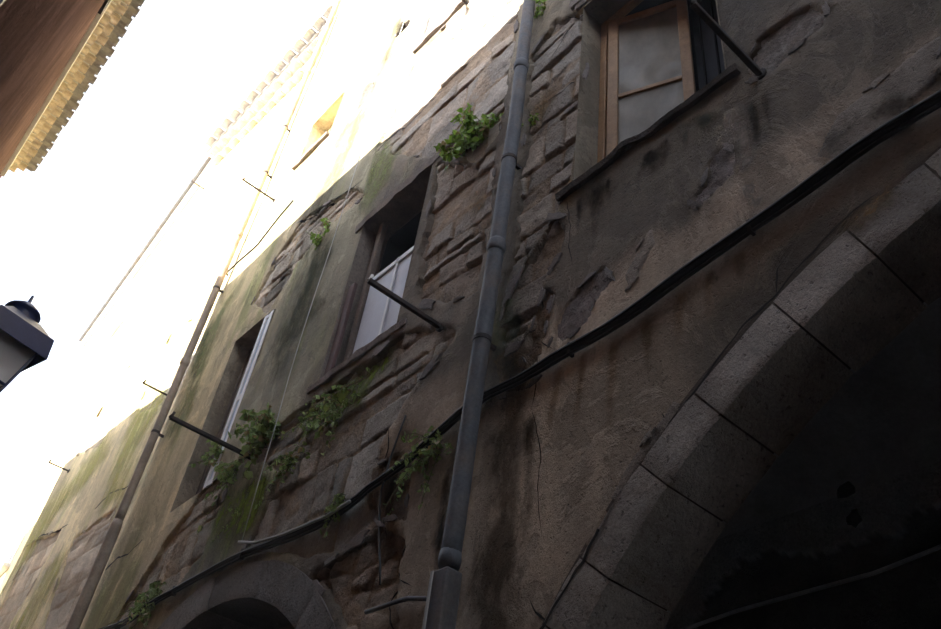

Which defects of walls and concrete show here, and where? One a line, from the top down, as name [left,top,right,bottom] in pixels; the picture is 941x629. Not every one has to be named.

flaking render [745,1,830,85]
flaking render [818,35,941,159]
flaking render [499,14,655,363]
flaking render [251,191,364,314]
flaking render [75,365,137,456]
flaking render [119,317,456,629]
water stain [476,312,533,629]
flaking render [45,508,116,629]